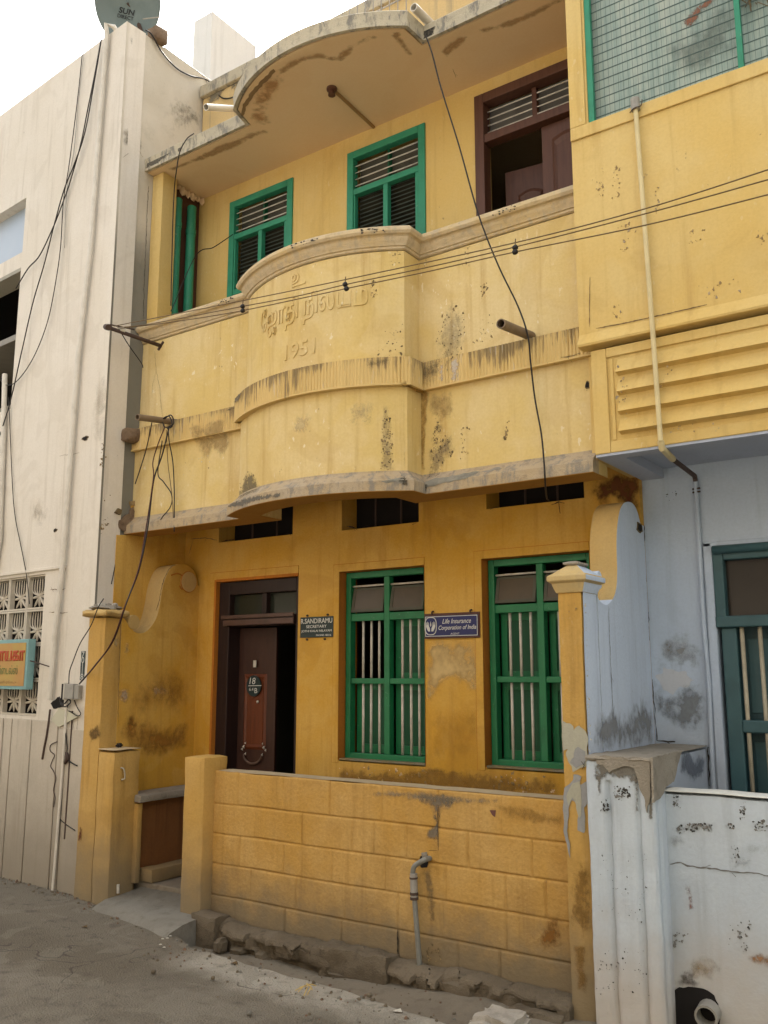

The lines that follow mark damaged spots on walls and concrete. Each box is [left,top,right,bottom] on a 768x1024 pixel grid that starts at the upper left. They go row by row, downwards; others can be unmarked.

damp [403,383,449,464]
damp [600,689,701,743]
damp [341,771,550,839]
peeling [493,696,592,856]
flaking render [600,786,631,811]
damp [682,754,704,777]
crack [670,862,767,877]